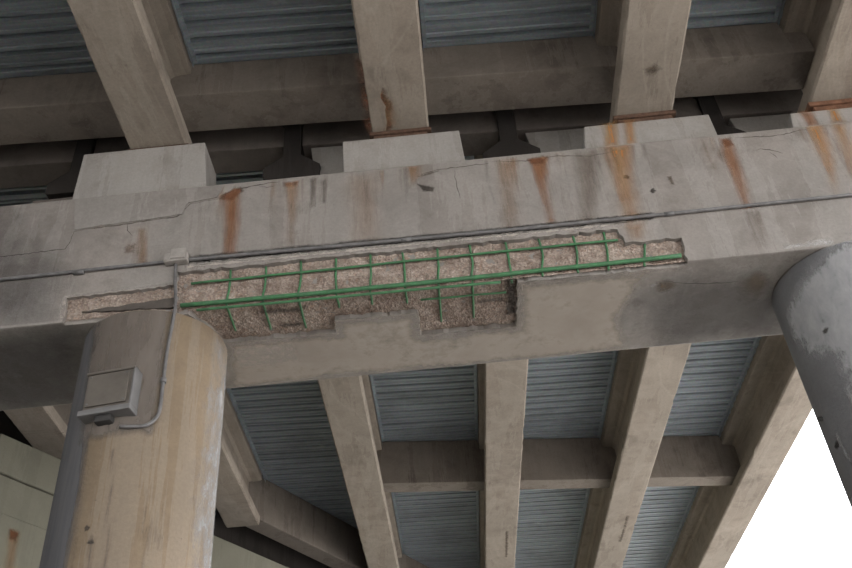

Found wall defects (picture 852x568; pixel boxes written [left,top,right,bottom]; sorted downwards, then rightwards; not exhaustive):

rust [528,158,546,188]
rust [723,139,743,196]
crack [0,196,220,257]
rust [221,188,242,252]
spalling [65,232,686,339]